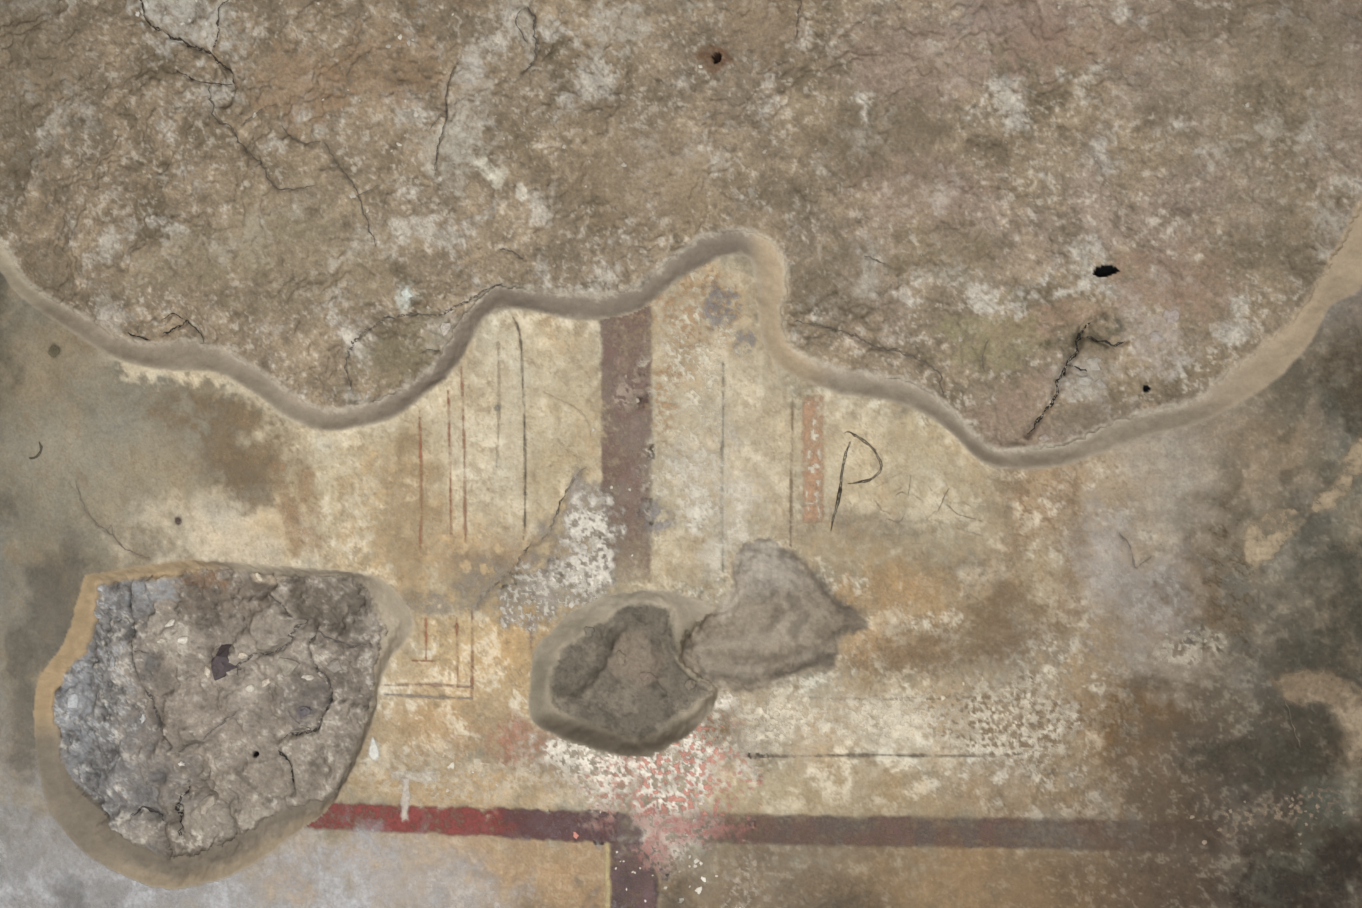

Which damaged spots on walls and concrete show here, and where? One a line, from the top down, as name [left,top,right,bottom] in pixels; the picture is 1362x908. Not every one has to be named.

crack [139,0,377,247]
crack [127,313,204,342]
crack [1027,322,1124,435]
spalling [33,474,1080,903]